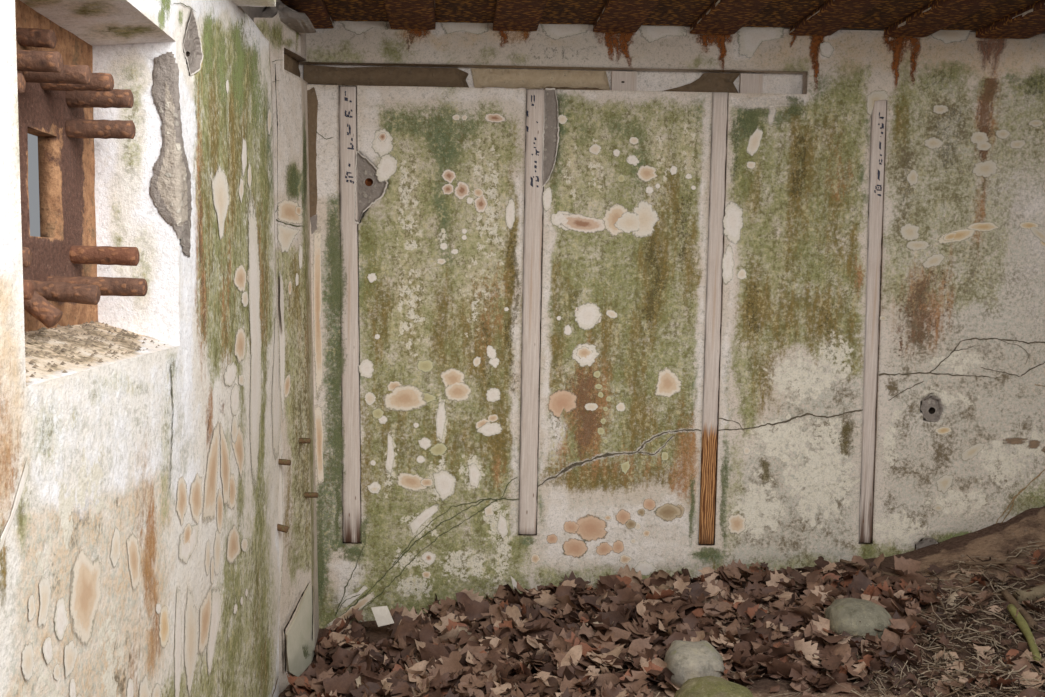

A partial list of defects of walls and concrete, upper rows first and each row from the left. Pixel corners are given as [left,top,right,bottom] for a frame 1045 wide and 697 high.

spalling [149,10,204,257]
water stain [203,10,266,128]
peeling [542,88,660,238]
water stain [732,96,804,176]
corrosion [809,36,824,89]
corrosion [882,36,921,85]
corrosion [977,38,1004,161]
peeling [156,87,324,697]
crack [272,409,863,697]
water stain [829,422,854,455]
crack [879,338,1045,400]
crack [996,469,1045,524]